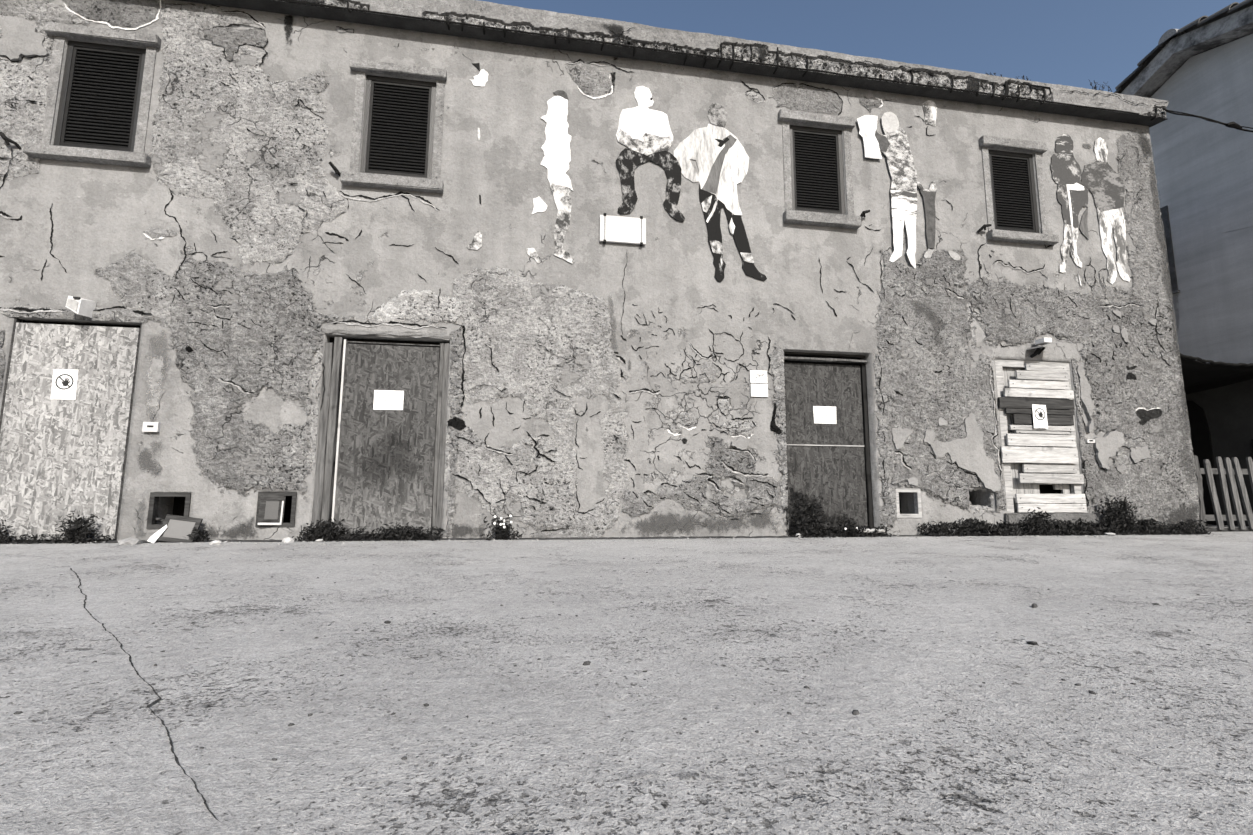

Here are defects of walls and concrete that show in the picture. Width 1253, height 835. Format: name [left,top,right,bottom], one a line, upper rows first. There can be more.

crack [179,4,268,98]
crack [294,98,323,152]
crack [567,28,632,85]
spalling [275,0,1167,121]
crack [817,56,911,115]
crack [0,148,262,395]
crack [277,182,439,278]
flaking render [0,0,788,537]
crack [389,244,458,264]
crack [328,252,796,520]
crack [819,224,1172,507]
flaking render [872,133,1200,530]